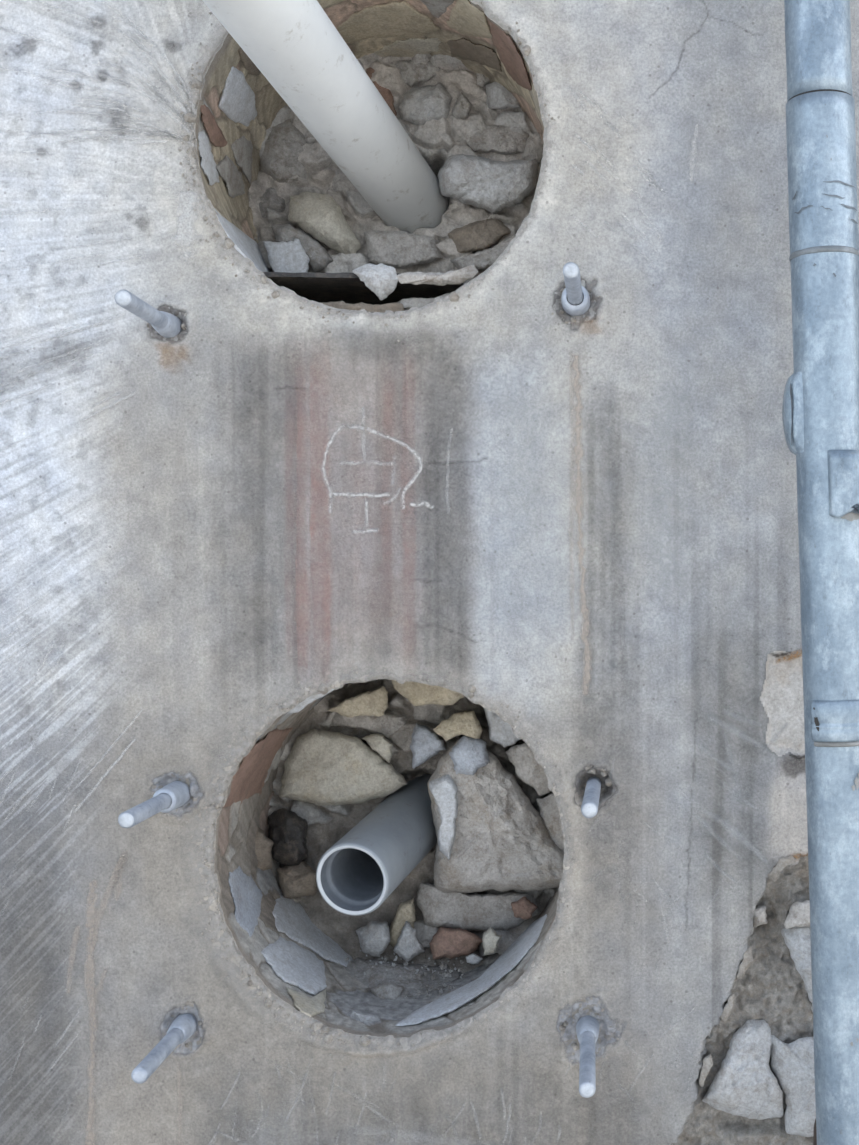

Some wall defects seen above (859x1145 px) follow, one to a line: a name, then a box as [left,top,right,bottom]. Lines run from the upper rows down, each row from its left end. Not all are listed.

peeling [760,650,805,774]
spalling [673,855,816,1145]